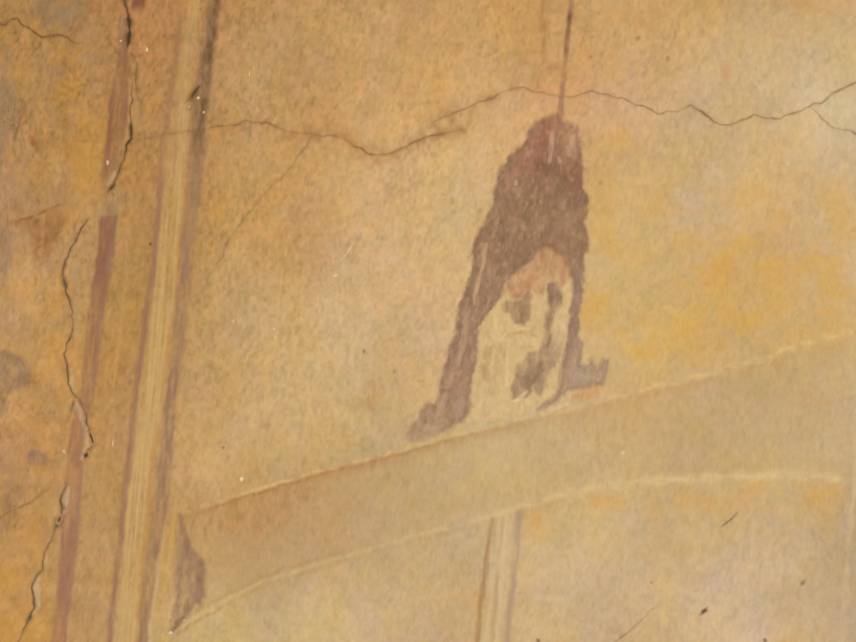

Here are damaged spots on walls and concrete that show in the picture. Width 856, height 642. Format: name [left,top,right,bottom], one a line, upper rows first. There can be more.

crack [0,16,85,46]
crack [105,0,856,297]
crack [59,216,98,462]
crack [0,478,72,642]